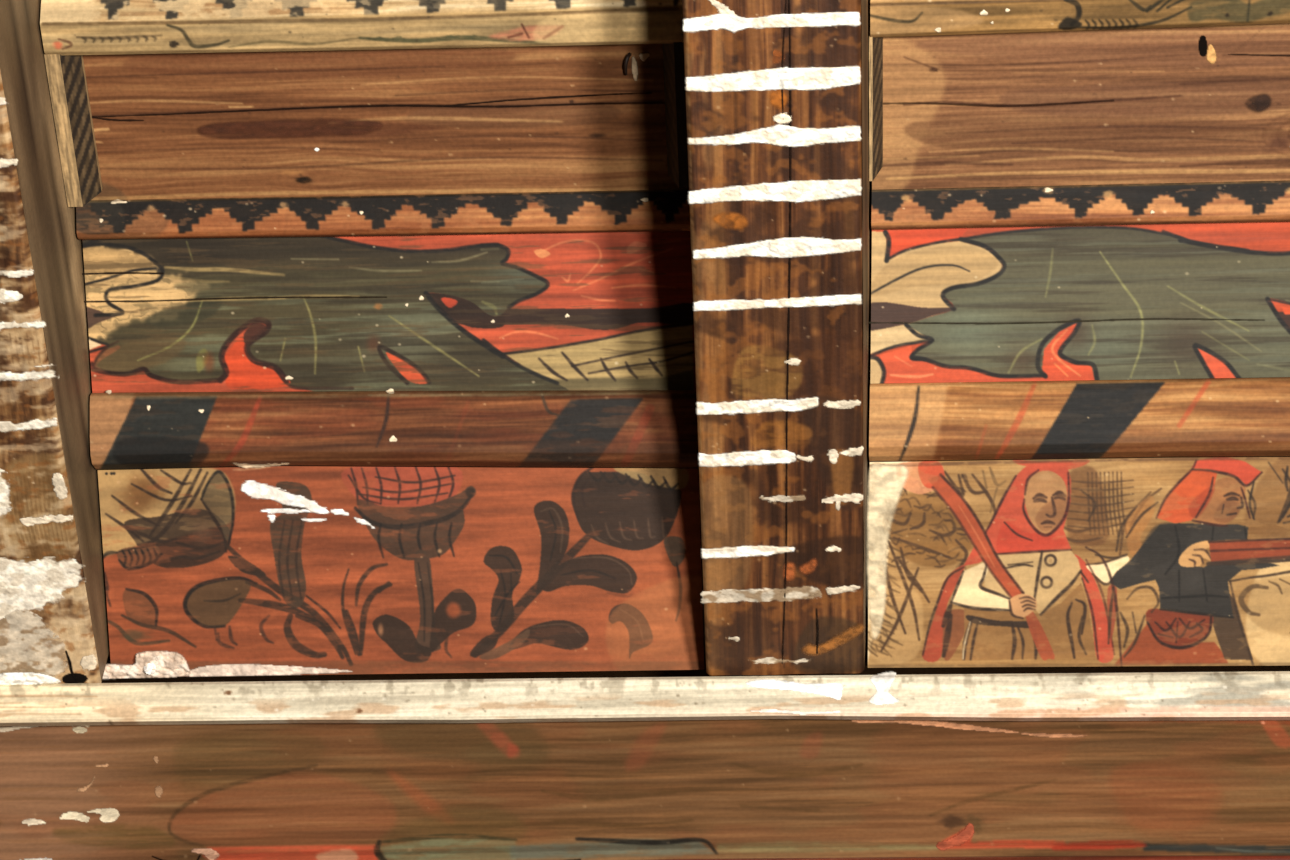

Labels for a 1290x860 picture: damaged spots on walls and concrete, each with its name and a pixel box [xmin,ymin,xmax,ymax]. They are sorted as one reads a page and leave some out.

peeling [143,663,156,675]
peeling [22,808,120,826]